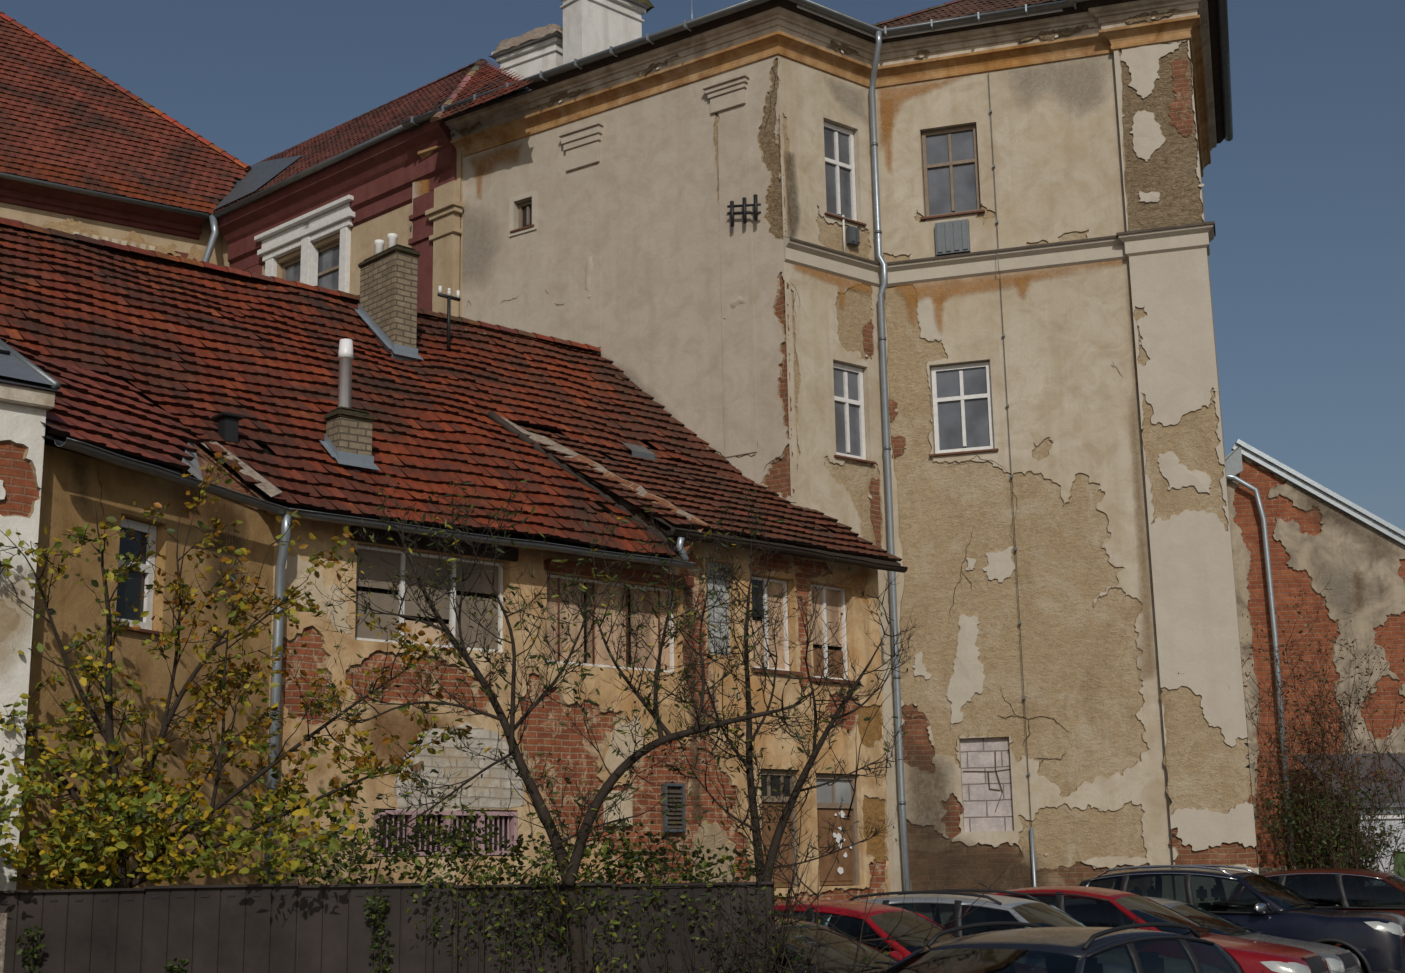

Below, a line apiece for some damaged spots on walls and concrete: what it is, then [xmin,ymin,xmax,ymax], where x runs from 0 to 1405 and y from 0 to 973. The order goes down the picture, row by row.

flaking render [757,58,792,240]
flaking render [1139,191,1160,203]
flaking render [1120,42,1193,162]
flaking render [759,272,801,499]
flaking render [0,440,43,518]
flaking render [748,552,833,688]
flaking render [824,283,1405,894]
flaking render [281,550,755,884]
flaking render [774,794,890,903]